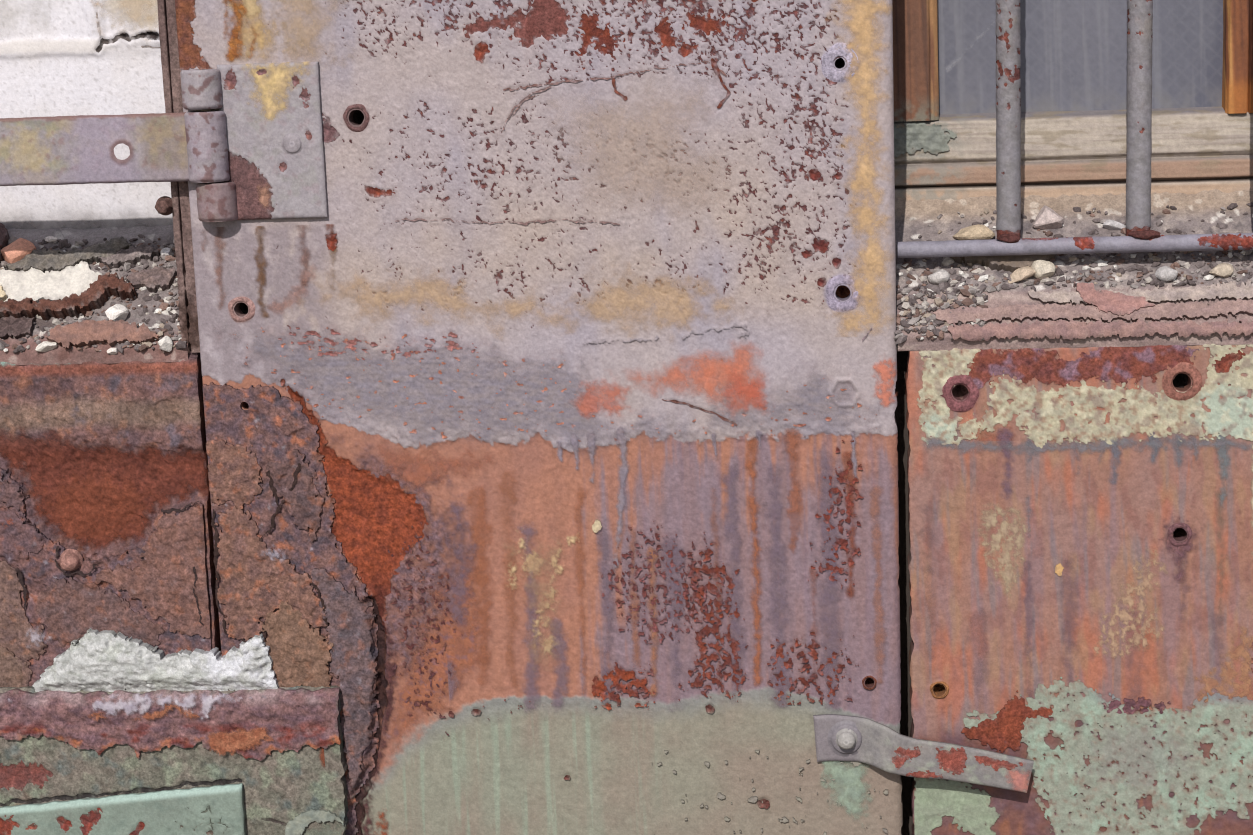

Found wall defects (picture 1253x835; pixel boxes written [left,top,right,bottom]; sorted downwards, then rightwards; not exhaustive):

crack [95,12,160,53]
corrosion [463,0,625,72]
corrosion [652,0,731,57]
corrosion [963,345,1200,389]
peeling [916,344,1253,448]
corrosion [1214,350,1246,373]
corrosion [483,429,884,720]
corrosion [0,379,490,835]
peeling [963,710,1000,729]
peeling [1012,675,1253,835]
peeling [285,808,345,835]
peeling [914,777,1000,835]